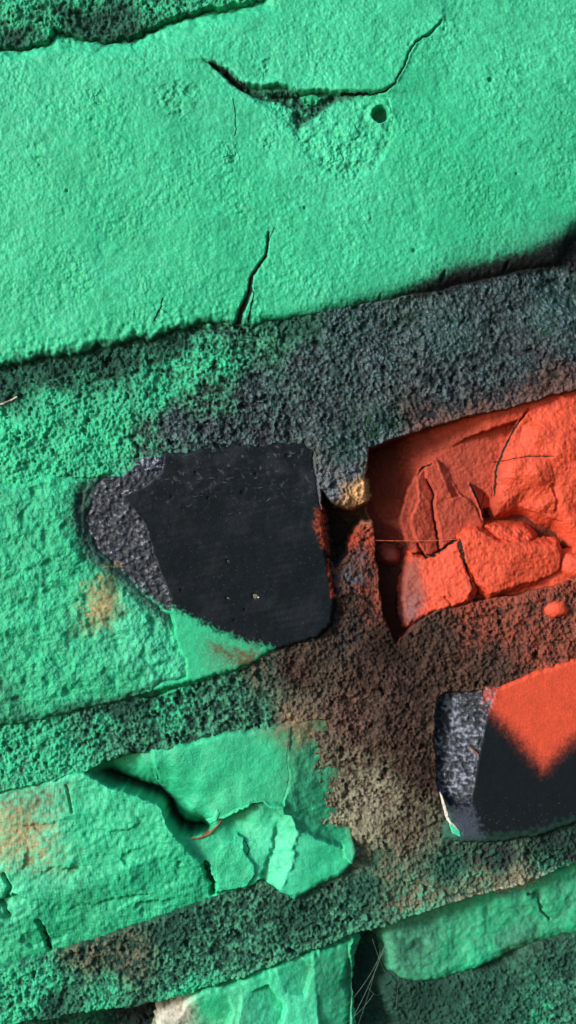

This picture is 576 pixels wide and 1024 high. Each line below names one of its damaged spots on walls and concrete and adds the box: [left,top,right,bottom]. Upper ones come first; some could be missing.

crack [208,62,246,136]
crack [340,22,441,97]
crack [236,228,274,329]
spalling [81,454,172,608]
crack [417,464,473,588]
spalling [397,390,576,628]
crack [469,410,555,519]
spalling [85,724,289,840]
spalling [215,832,256,890]